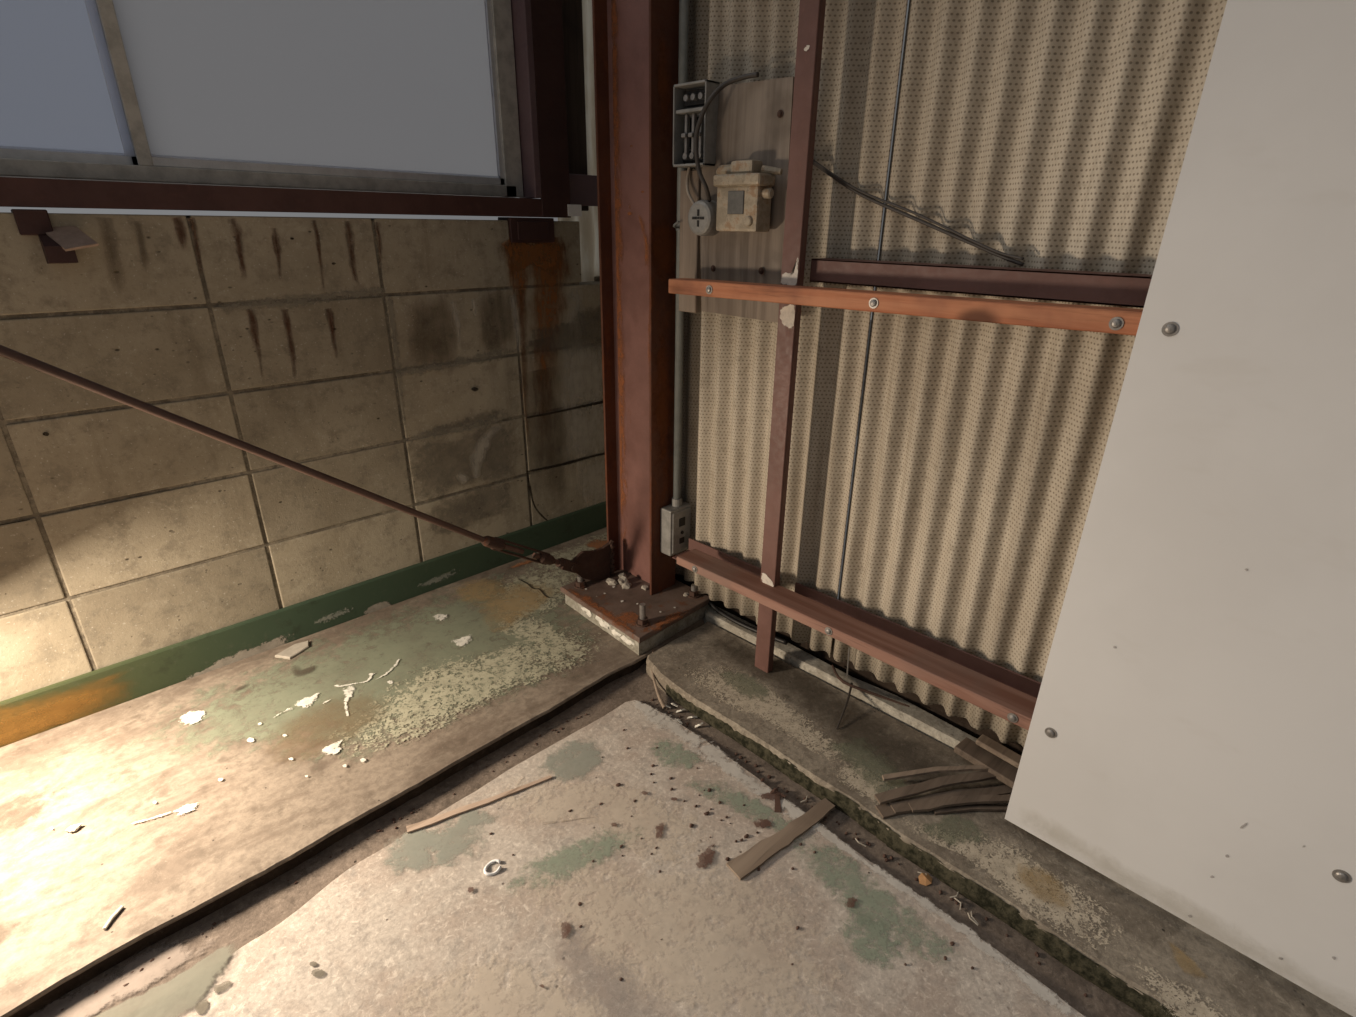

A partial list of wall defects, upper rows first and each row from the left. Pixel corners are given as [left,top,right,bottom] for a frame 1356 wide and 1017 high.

damp [174,217,200,265]
damp [232,220,245,270]
corrosion [611,0,627,511]
corrosion [652,224,676,277]
corrosion [573,592,639,632]
corrosion [0,688,113,744]